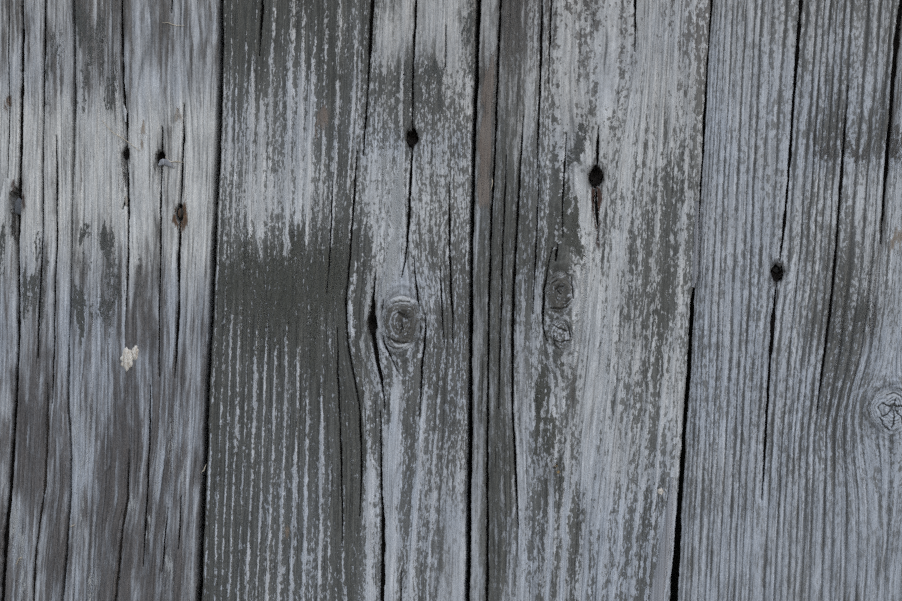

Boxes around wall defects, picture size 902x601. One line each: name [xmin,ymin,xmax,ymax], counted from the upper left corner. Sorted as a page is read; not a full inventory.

crack [326,0,453,601]
peeling [477,53,494,210]
crack [593,126,601,241]
crack [762,280,777,495]
crack [780,0,803,258]
crack [880,0,902,240]